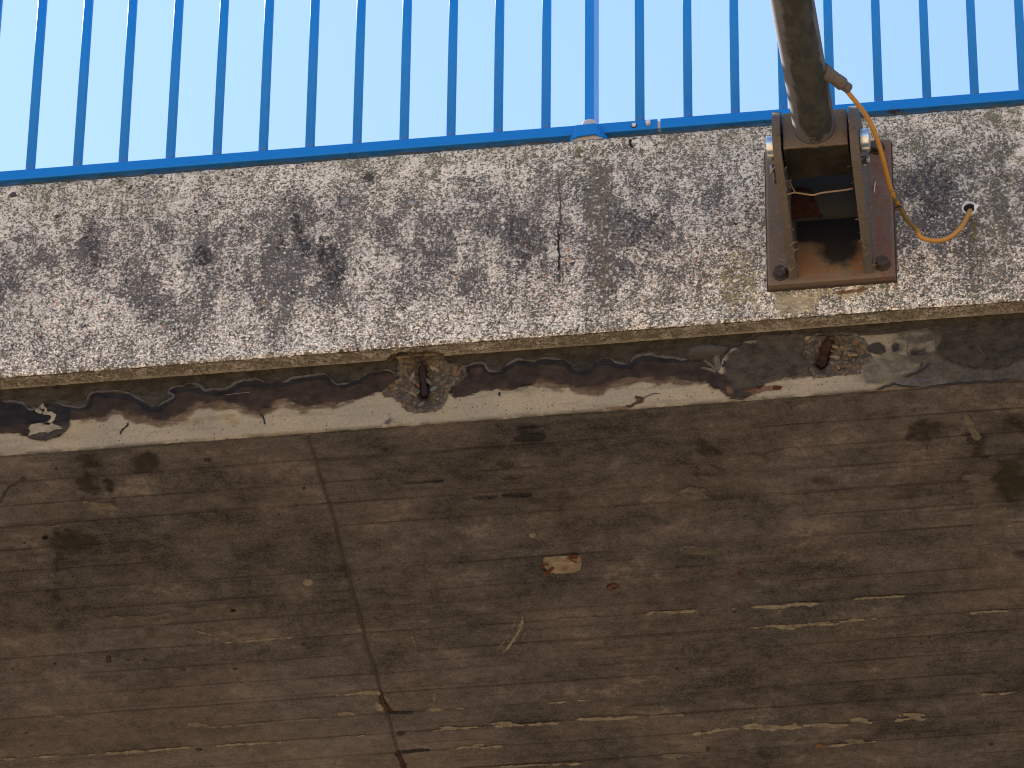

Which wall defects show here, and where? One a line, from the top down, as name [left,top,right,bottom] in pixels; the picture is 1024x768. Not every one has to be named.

leakage [276,201,316,259]
crack [555,178,563,282]
leakage [584,152,616,294]
peeling [28,404,62,436]
leakage [0,369,398,441]
spalling [382,351,469,413]
leakage [445,319,1024,400]
spalling [803,332,873,378]